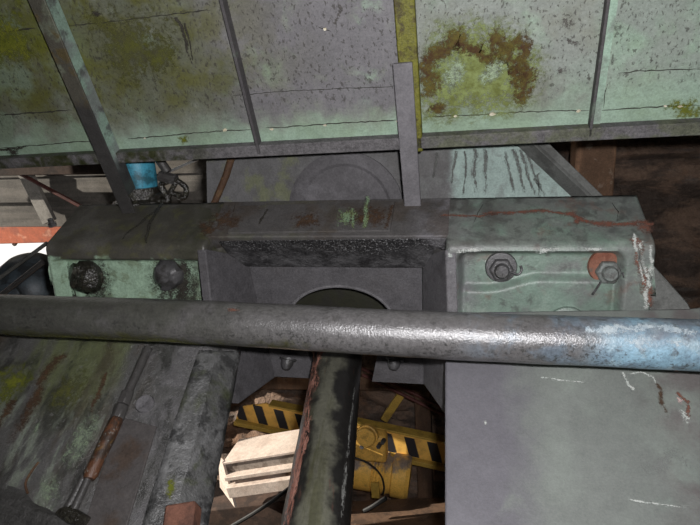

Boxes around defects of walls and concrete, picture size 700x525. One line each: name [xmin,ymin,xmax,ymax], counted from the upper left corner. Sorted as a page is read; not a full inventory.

leakage [174,17,193,62]
leakage [419,18,542,122]
leakage [665,99,700,118]
corrosion [337,196,394,229]
corrosion [441,209,654,233]